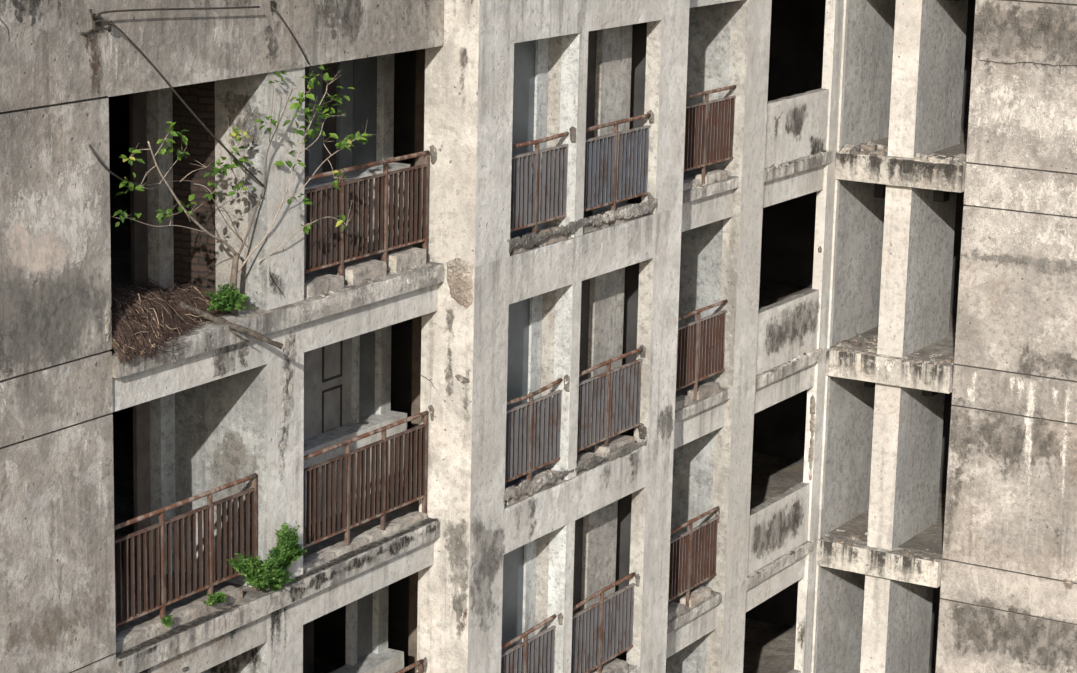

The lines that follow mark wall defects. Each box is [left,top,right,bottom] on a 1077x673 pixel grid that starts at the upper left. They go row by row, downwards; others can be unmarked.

damp [0,0,41,27]
damp [315,0,364,46]
crack [980,60,1077,71]
damp [775,105,808,136]
spalling [509,192,658,254]
spalling [289,258,474,320]
damp [943,346,1077,544]
damp [752,500,804,559]
damp [950,597,1077,673]